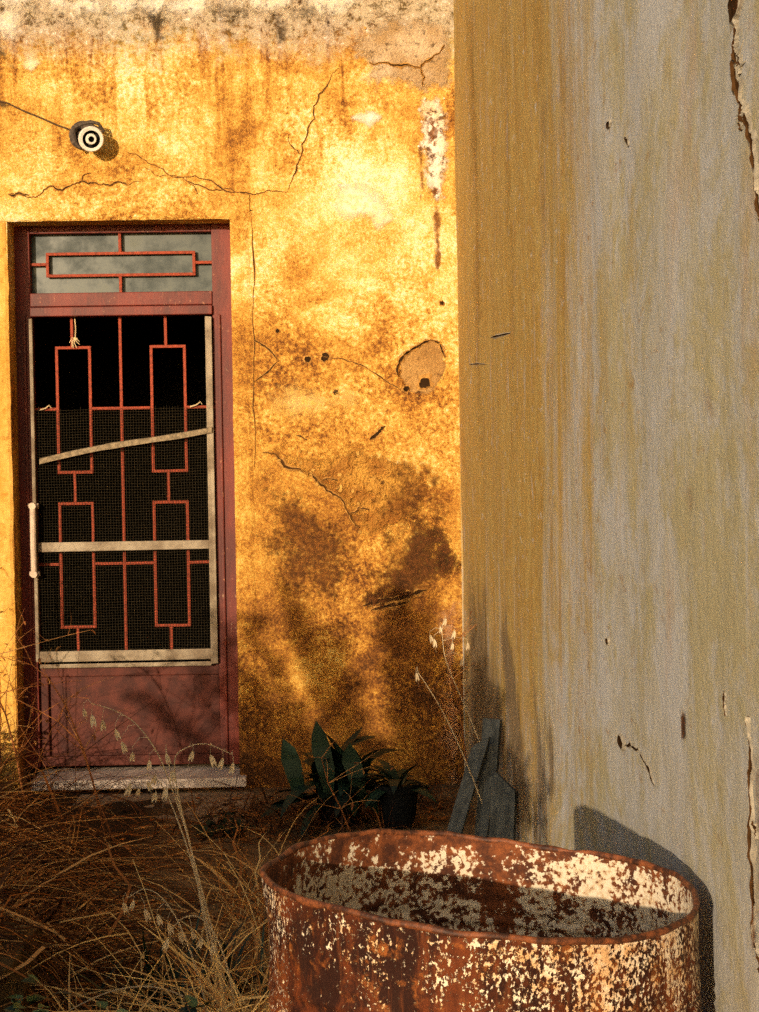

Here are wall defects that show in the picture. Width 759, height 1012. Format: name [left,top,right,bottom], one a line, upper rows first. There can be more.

leakage [0,0,29,39]
leakage [50,0,206,39]
leakage [222,0,364,41]
crack [369,45,445,87]
flaking render [352,18,455,199]
crack [8,68,340,467]
crack [394,339,445,376]